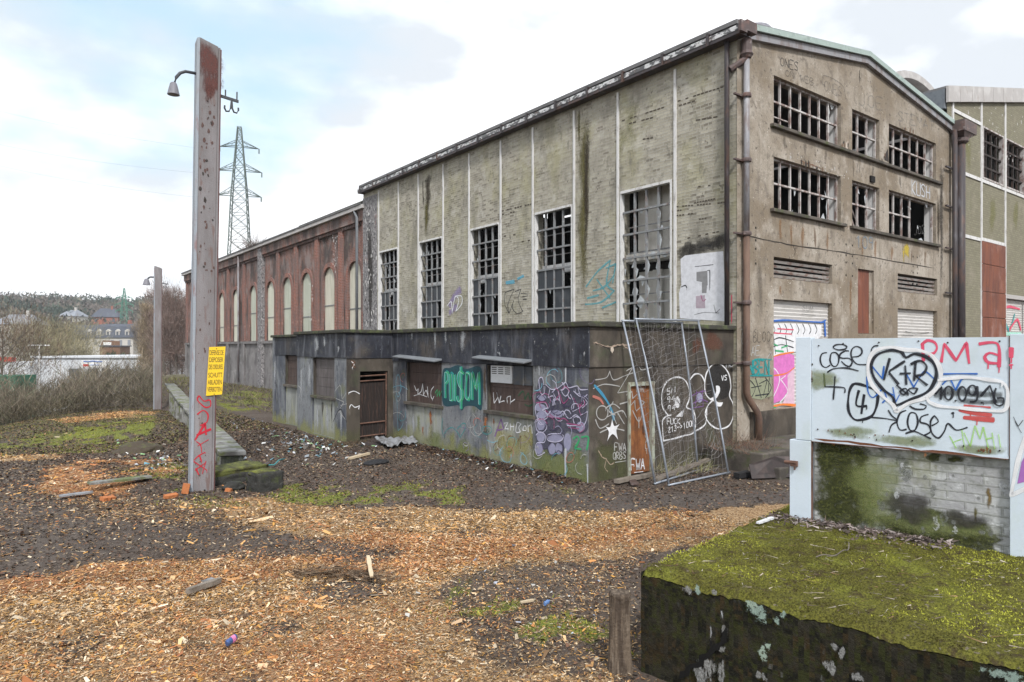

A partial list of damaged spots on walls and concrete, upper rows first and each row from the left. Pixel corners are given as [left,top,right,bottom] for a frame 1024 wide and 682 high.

rust [200,44,222,100]
water stain [422,175,430,230]
water stain [578,114,589,278]
peeling [365,207,377,324]